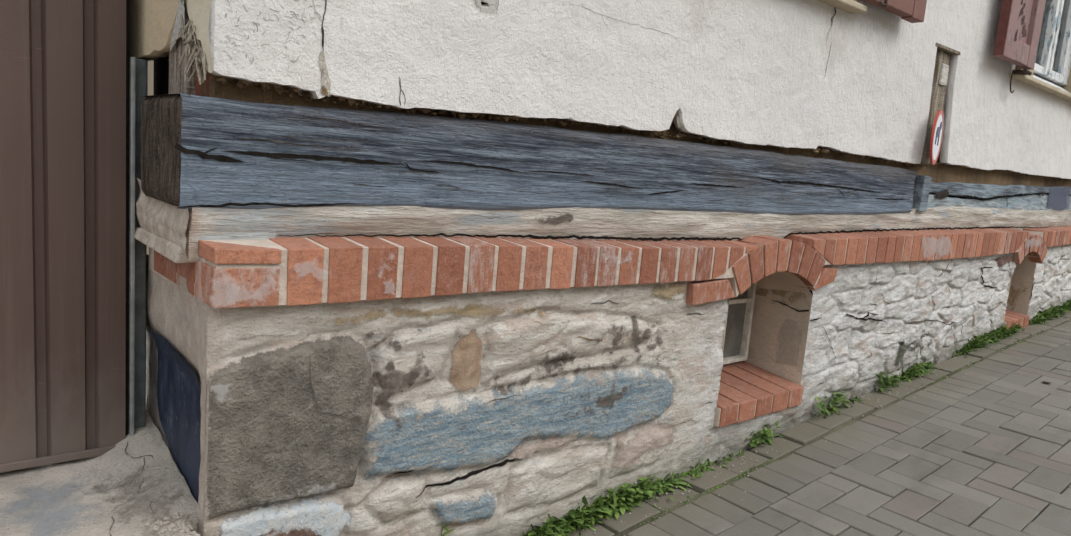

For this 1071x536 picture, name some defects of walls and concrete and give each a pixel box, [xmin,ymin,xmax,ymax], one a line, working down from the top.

crack [314,0,327,76]
spalling [170,0,1071,181]
crack [174,115,1056,239]
crack [278,233,746,241]
crack [530,320,597,356]
crack [772,256,1012,358]
crack [643,402,713,426]
crack [386,440,580,498]